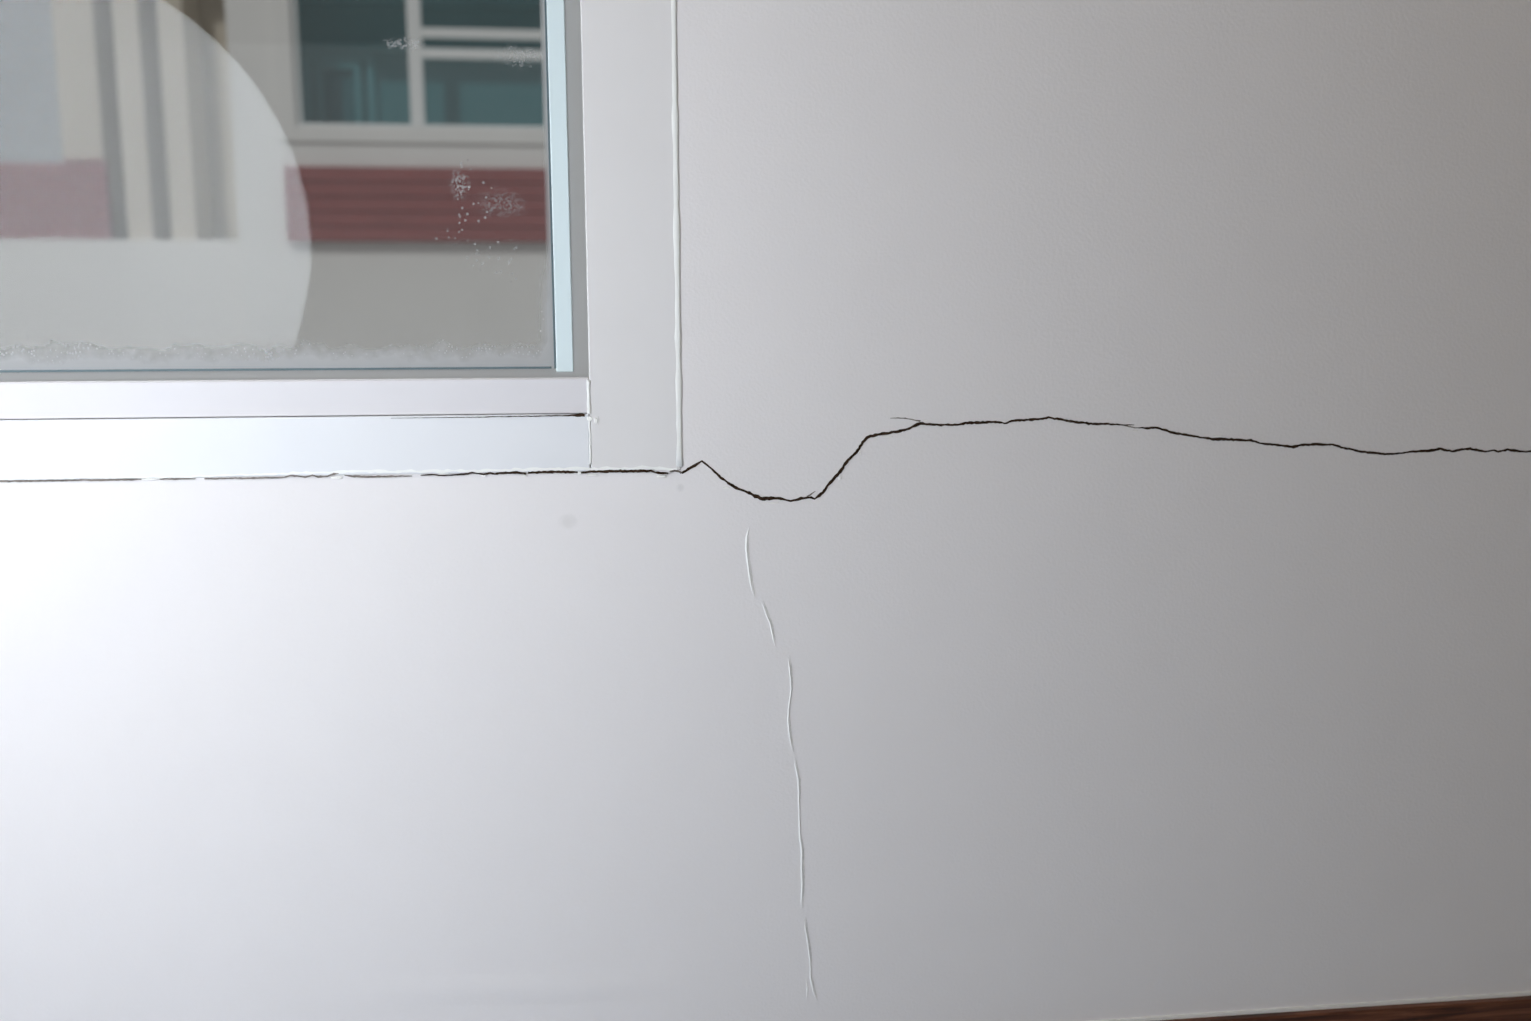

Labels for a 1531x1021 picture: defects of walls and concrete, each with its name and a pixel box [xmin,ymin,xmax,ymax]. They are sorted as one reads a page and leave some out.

crack [422,411,585,419]
crack [0,416,1531,999]